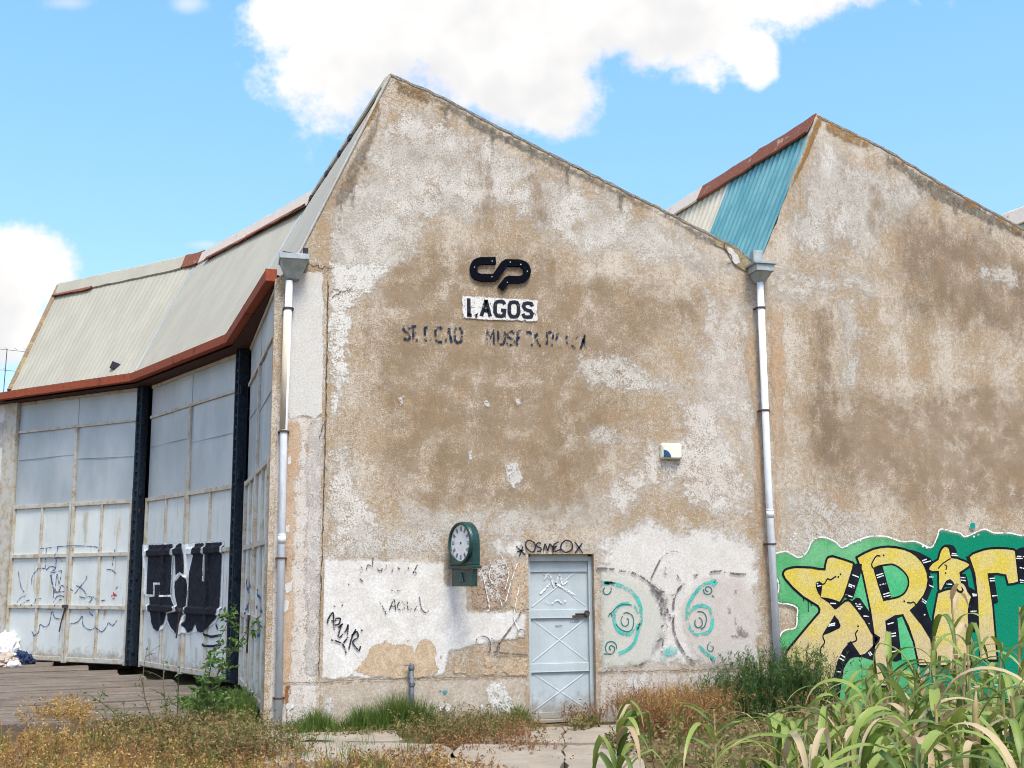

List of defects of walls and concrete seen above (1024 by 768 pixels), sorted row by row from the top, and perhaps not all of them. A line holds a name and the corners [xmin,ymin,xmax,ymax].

water stain [401,82,717,246]
water stain [886,154,1024,331]
water stain [813,362,1024,508]
peeling [283,419,528,726]